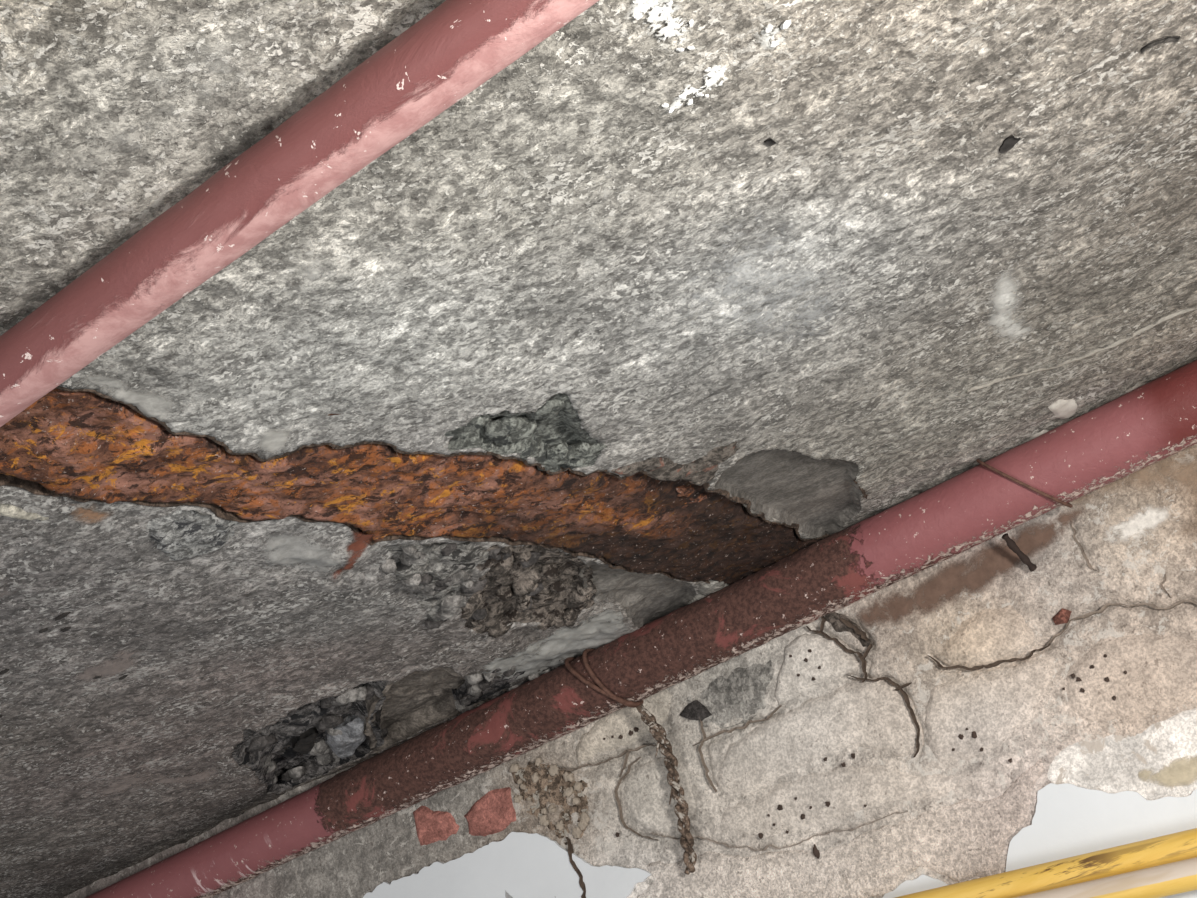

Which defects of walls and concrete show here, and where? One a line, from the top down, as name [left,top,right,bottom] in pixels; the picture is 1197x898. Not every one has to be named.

rust [333,533,373,579]
spalling [0,474,710,638]
peeling [56,386,862,541]
rust [676,485,707,508]
crack [1071,521,1097,571]
peeling [210,444,1197,898]
crack [806,616,920,757]
crack [927,574,1197,671]
crack [528,744,907,851]
crack [693,705,782,792]